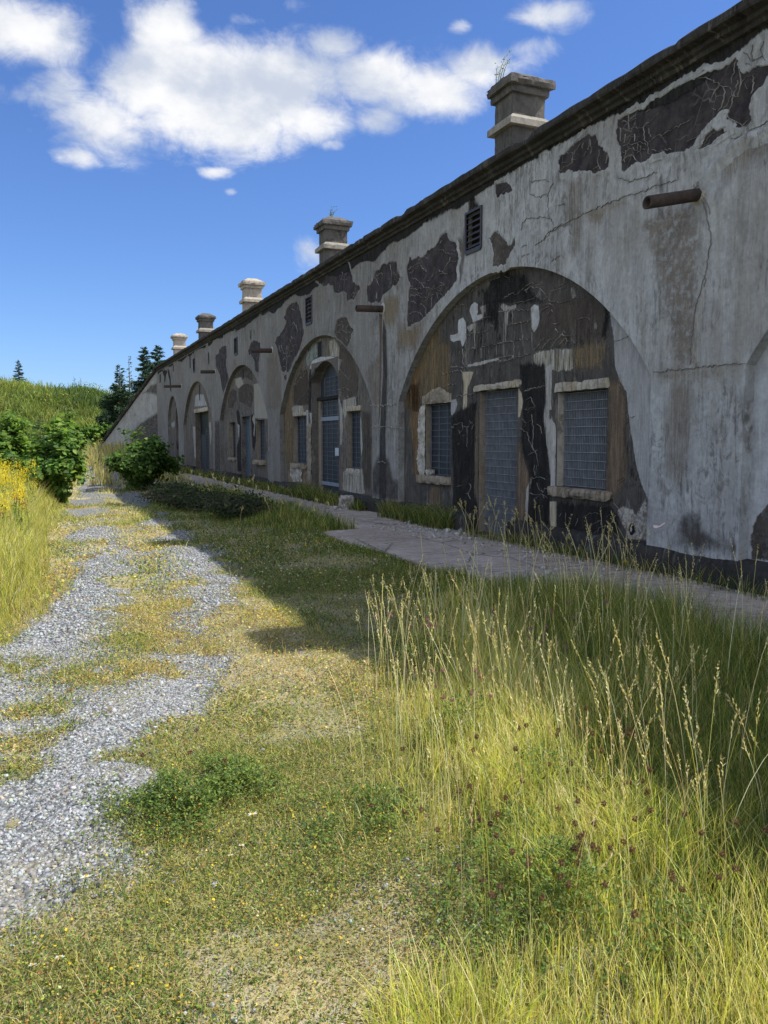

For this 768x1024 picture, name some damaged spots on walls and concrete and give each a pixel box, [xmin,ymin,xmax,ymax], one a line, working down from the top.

spalling [554,50,768,183]
spalling [216,337,261,408]
spalling [274,298,305,385]
spalling [315,225,461,351]
spalling [487,224,519,273]
crack [374,41,767,446]